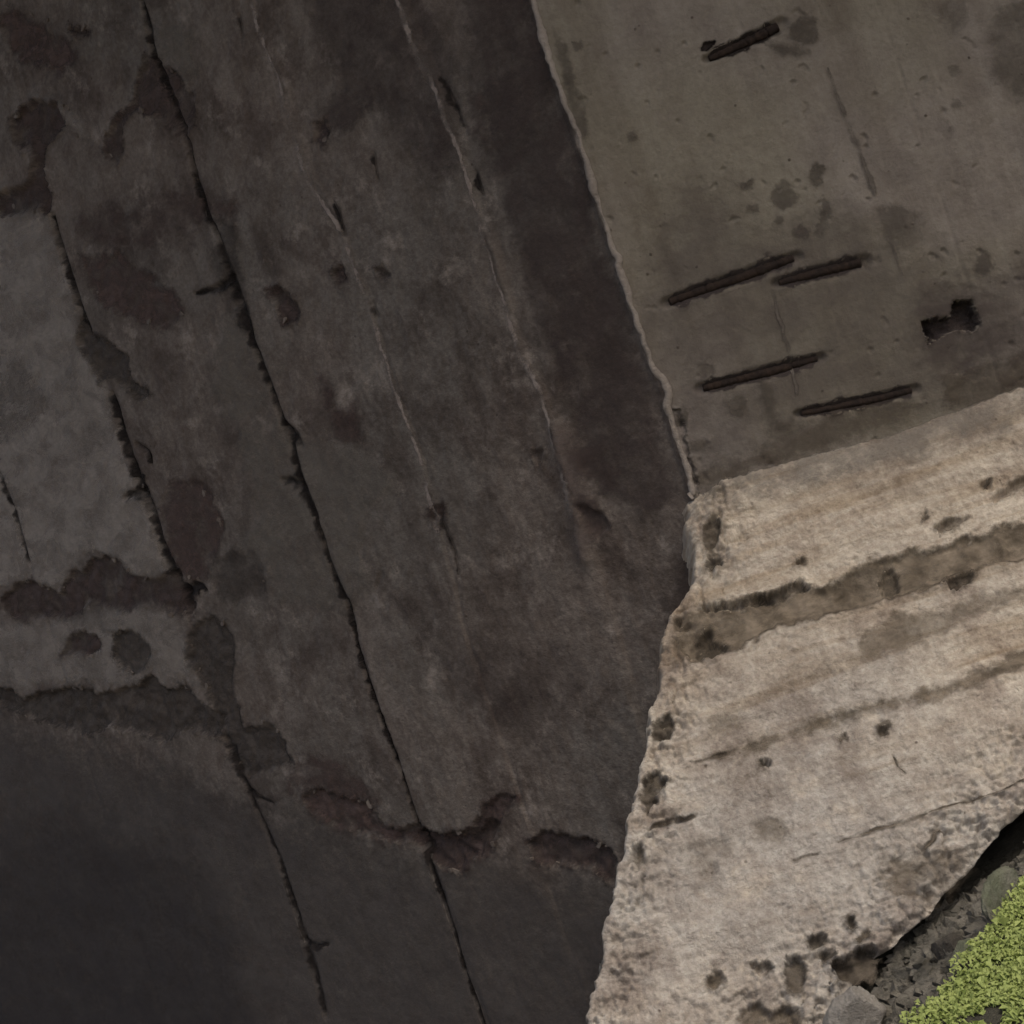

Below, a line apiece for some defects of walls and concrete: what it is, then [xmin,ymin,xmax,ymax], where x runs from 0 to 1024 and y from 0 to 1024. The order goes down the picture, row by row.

spalling [701,22,780,62]
spalling [668,254,862,307]
spalling [921,301,980,345]
spalling [702,354,818,392]
spalling [800,385,912,417]
crack [110,395,207,600]
crack [192,174,414,805]
crack [650,814,695,830]
crack [793,779,1024,862]
crack [228,743,329,1010]
damp [0,726,612,1024]
crack [424,828,486,1024]